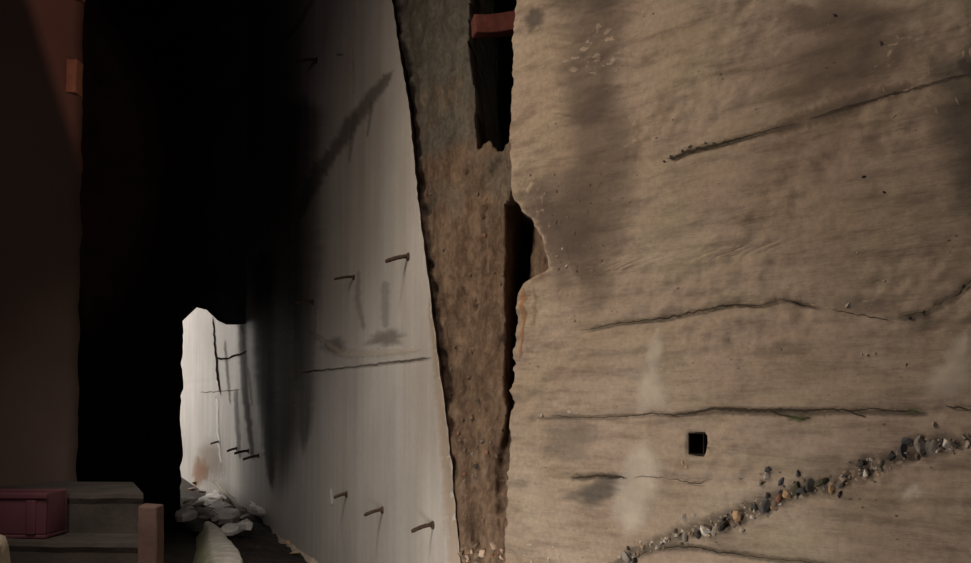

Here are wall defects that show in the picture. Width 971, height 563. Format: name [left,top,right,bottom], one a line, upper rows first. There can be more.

crack [663,74,967,163]
crack [587,280,971,330]
water stain [239,258,274,484]
crack [543,407,923,420]
crack [570,475,704,484]
crack [634,546,810,563]